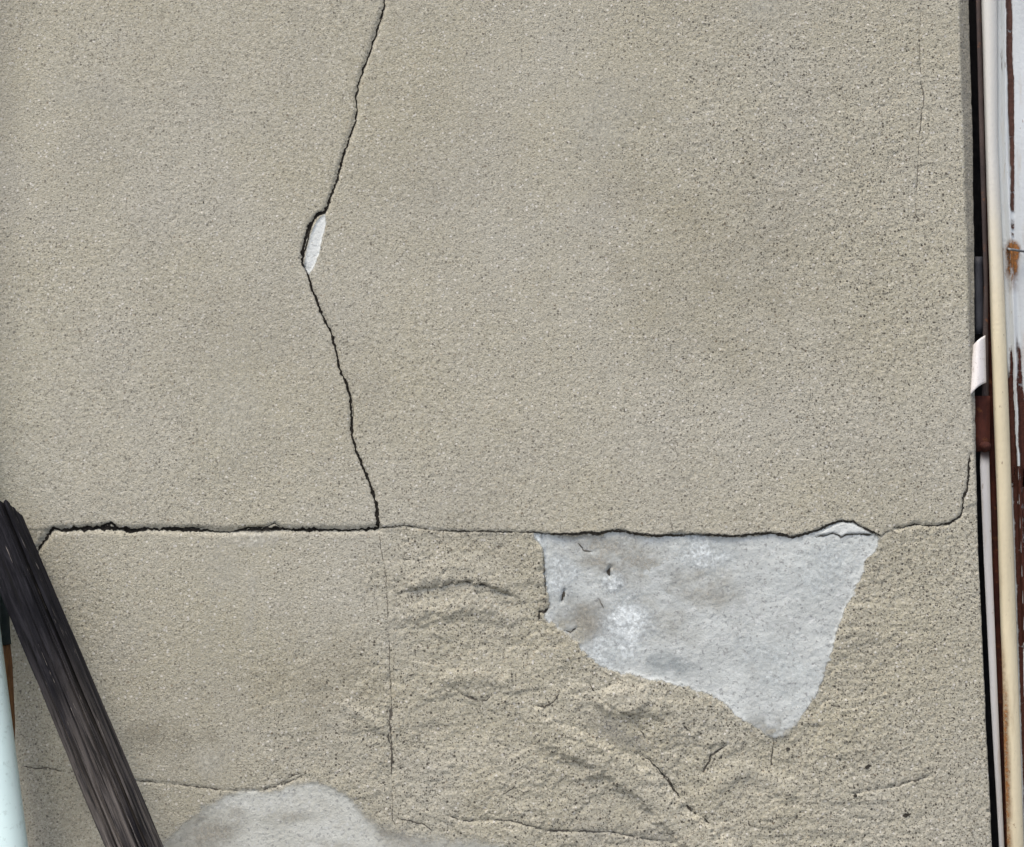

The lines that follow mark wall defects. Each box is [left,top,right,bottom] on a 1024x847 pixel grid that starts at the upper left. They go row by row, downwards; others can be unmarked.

crack [915,14,925,221]
rust [1006,0,1020,278]
spalling [305,215,326,274]
crack [38,0,672,843]
crack [883,456,971,535]
peeling [533,520,880,751]
peeling [170,782,496,847]